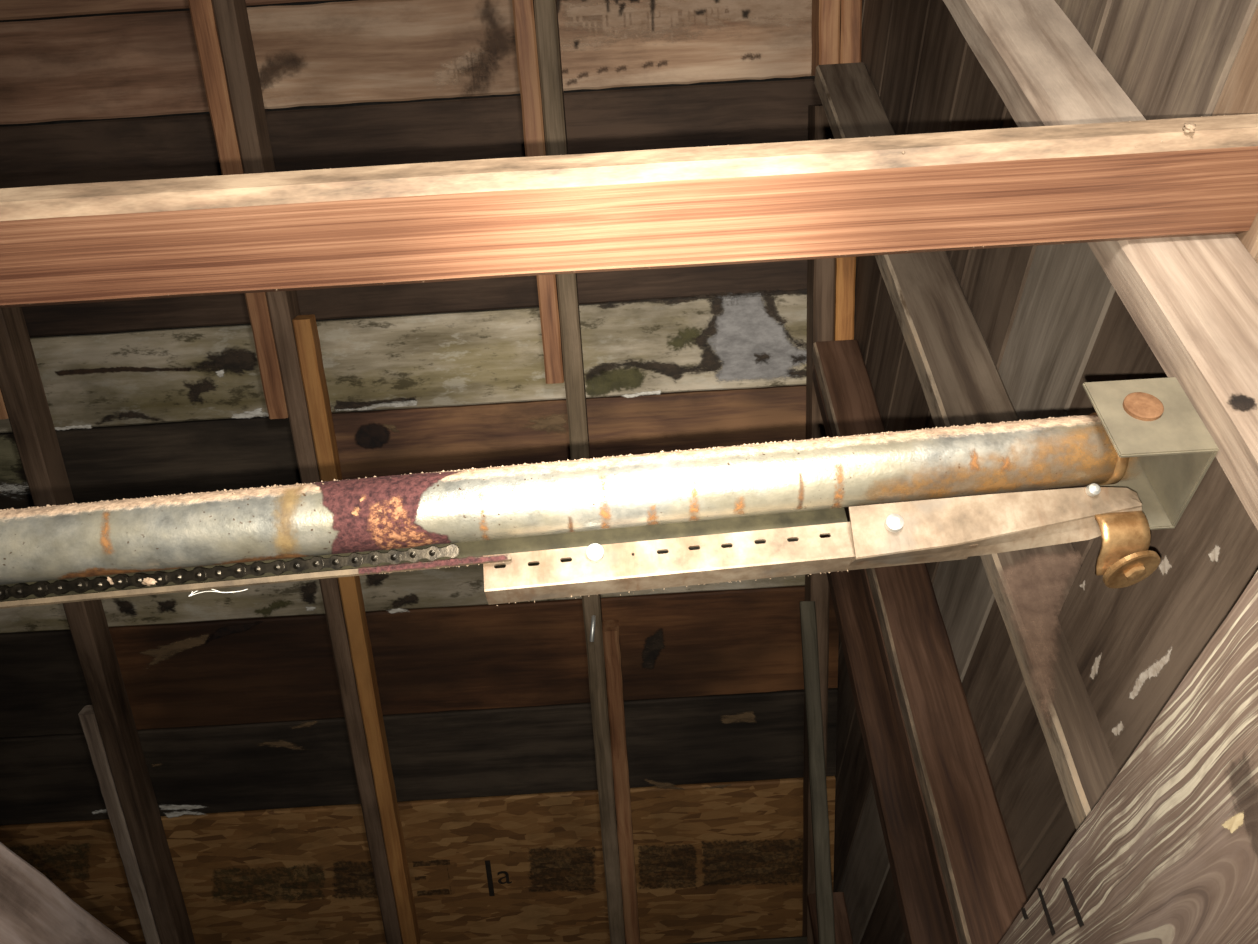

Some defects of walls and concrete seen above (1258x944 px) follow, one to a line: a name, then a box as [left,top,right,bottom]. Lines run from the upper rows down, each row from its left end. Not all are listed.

leakage [435,1,515,91]
leakage [184,348,257,404]
leakage [585,289,807,397]
leakage [96,411,164,424]
corrosion [215,489,306,565]
corrosion [313,472,457,554]
corrosion [834,466,843,508]
corrosion [882,428,1117,498]
corrosion [59,568,179,579]
corrosion [359,555,507,574]